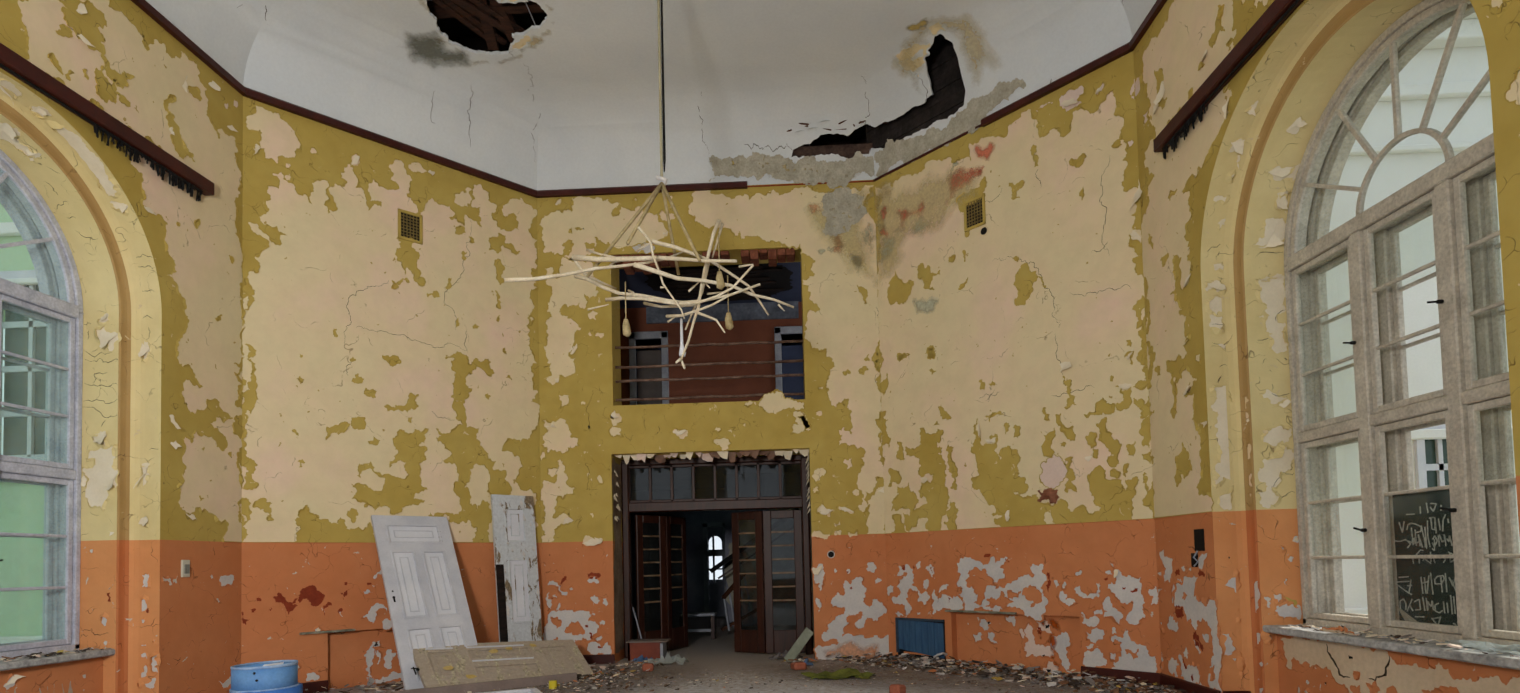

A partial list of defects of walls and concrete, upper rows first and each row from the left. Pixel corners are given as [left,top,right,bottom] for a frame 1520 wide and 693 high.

leakage [409,36,468,65]
leakage [810,144,993,271]
peeling [0,0,679,552]
peeling [536,0,1520,693]
peeling [140,573,178,624]
peeling [209,574,235,603]
peeling [361,569,403,685]
peeling [137,639,180,693]
peeling [298,663,337,688]
crack [1326,644,1390,681]